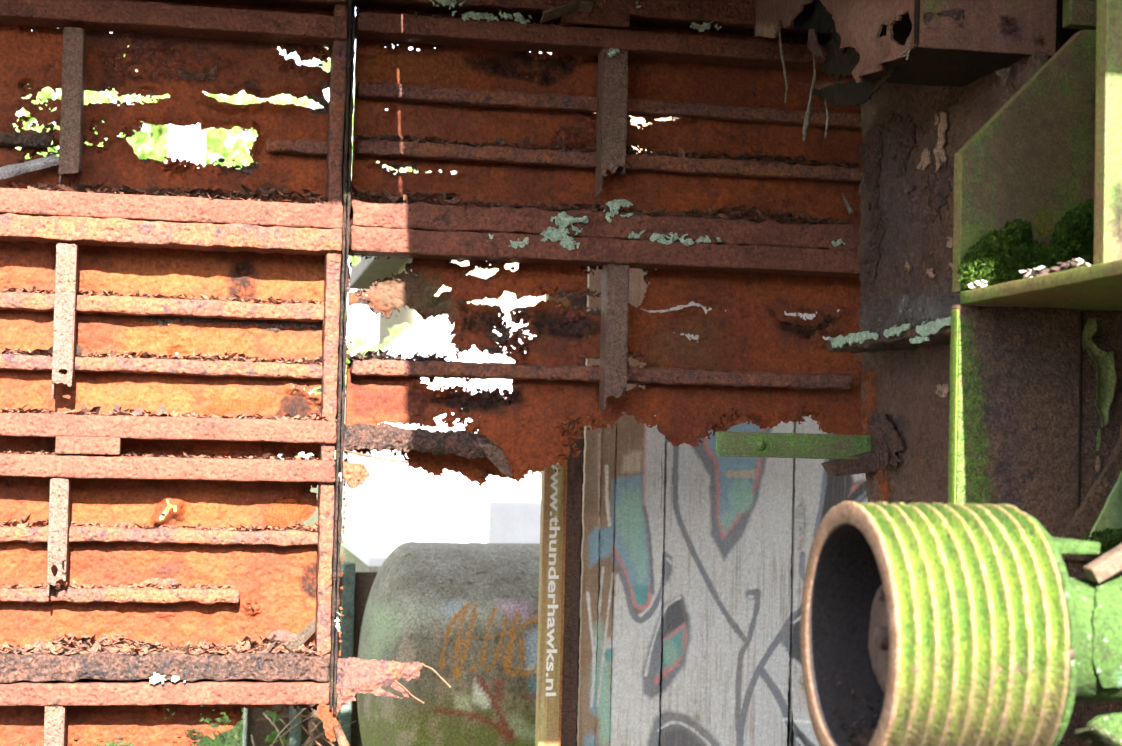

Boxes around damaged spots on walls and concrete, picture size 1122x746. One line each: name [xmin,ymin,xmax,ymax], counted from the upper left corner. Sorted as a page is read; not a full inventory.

peeling [291,47,331,107]
peeling [917,111,948,173]
peeling [347,288,393,318]
peeling [489,305,530,338]